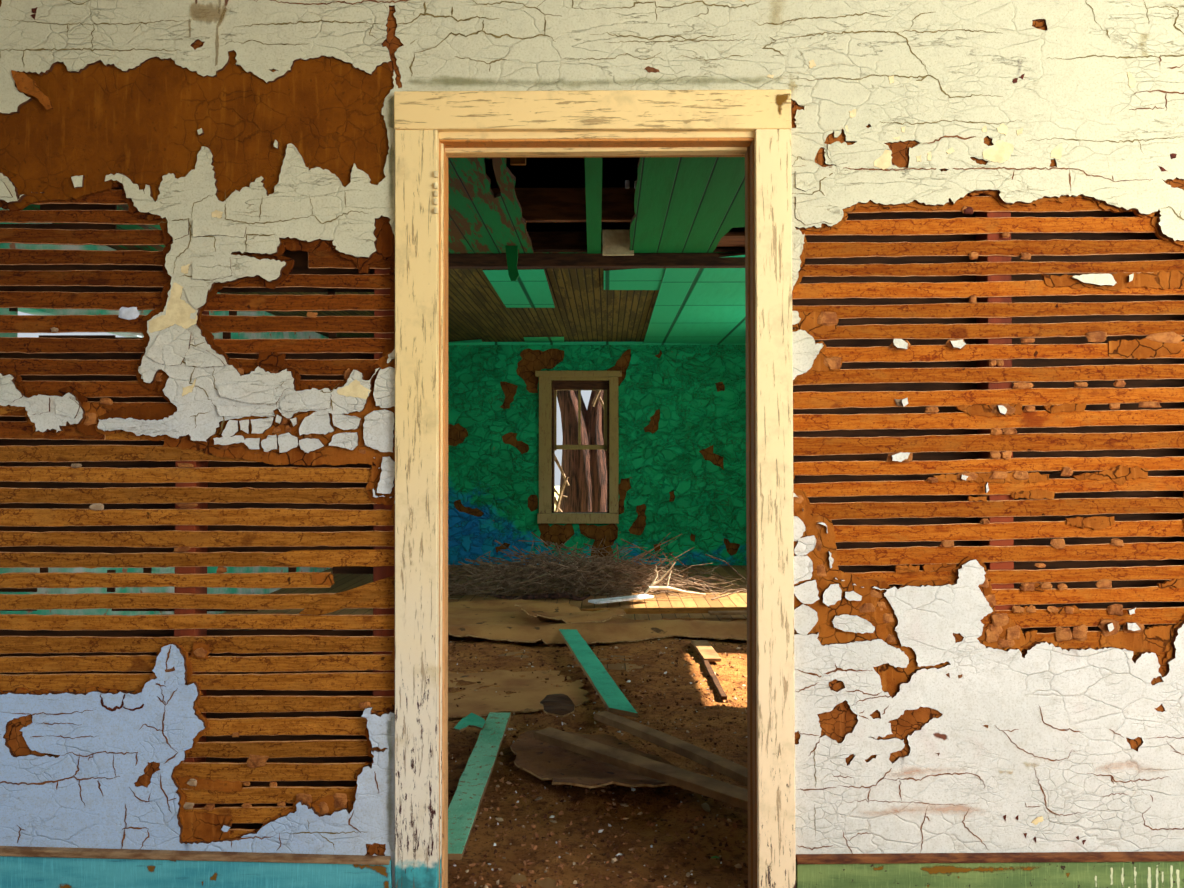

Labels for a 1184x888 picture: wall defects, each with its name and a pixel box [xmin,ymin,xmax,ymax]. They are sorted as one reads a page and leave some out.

crack [0,0,194,65]
crack [233,0,1184,196]
spalling [874,127,947,172]
spalling [1159,153,1184,190]
spalling [0,6,404,842]
spalling [792,190,1184,697]
peeling [538,478,646,560]
crack [0,645,178,849]
crack [796,664,892,719]
spalling [817,679,942,762]
crack [797,732,987,854]
crack [1000,706,1184,830]